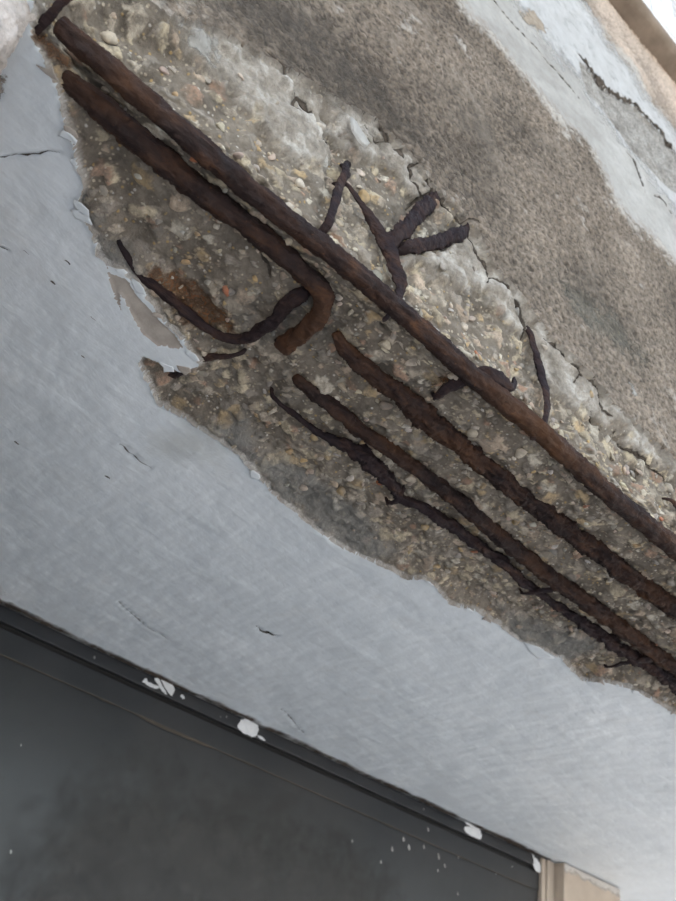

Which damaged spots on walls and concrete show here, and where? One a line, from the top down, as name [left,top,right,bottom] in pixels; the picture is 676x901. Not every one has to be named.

spalling [29,0,676,714]
corrosion [33,0,676,621]
corrosion [270,374,676,696]